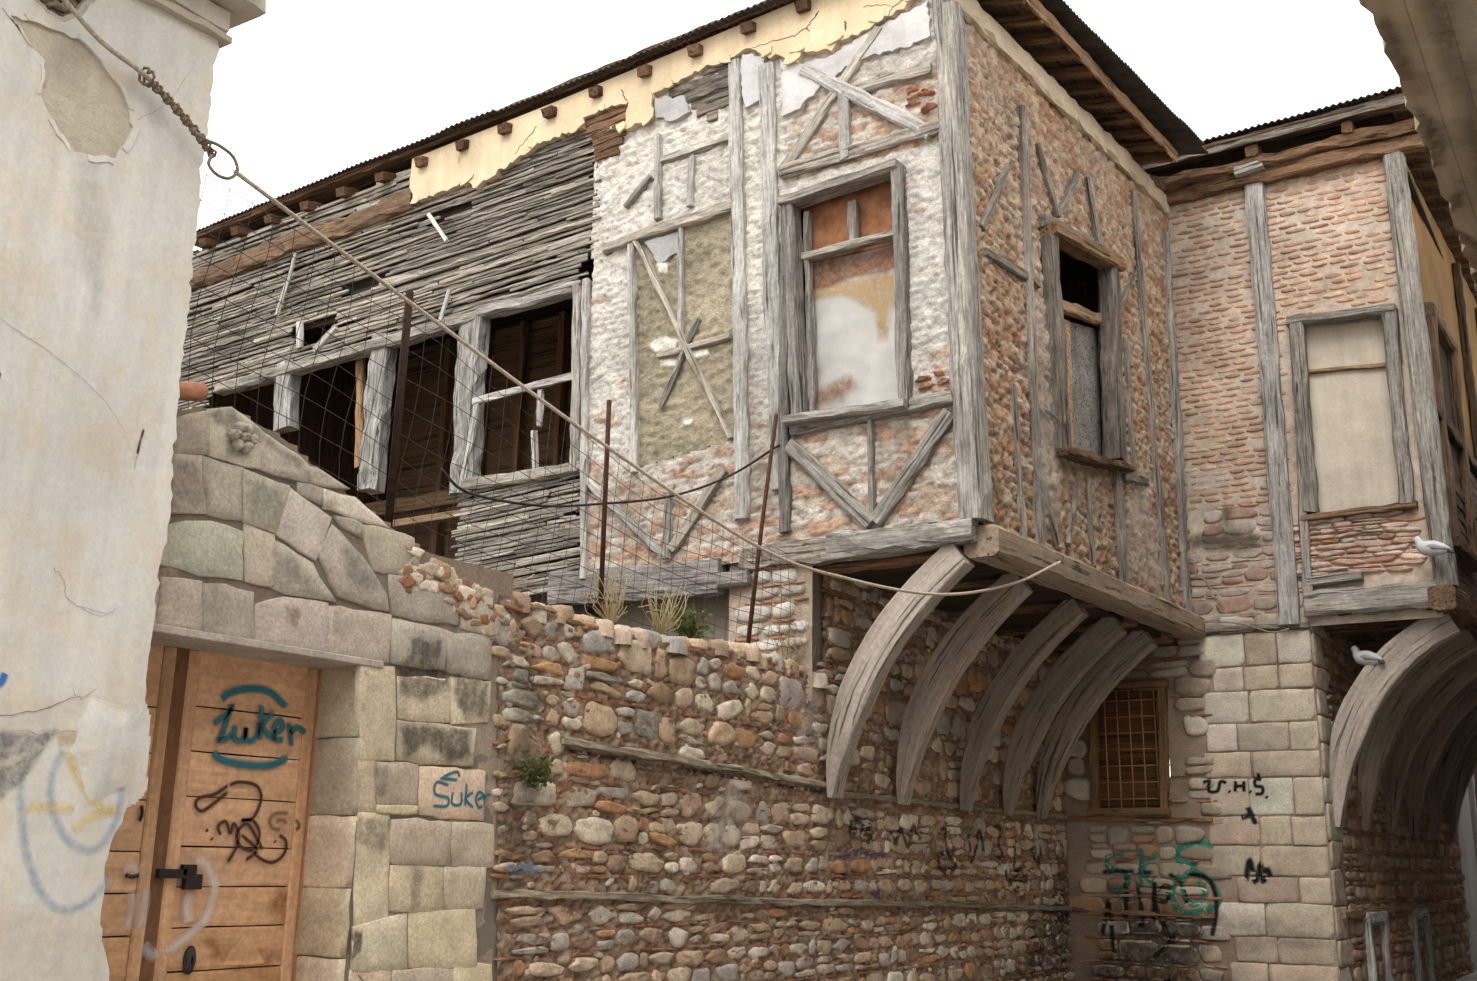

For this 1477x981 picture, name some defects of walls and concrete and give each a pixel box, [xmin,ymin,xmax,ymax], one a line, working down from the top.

flaking render [868,12,885,23]
flaking render [718,53,731,63]
flaking render [760,45,805,65]
flaking render [3,0,140,165]
spalling [905,87,938,114]
flaking render [569,119,585,134]
flaking render [616,106,654,133]
spalling [915,370,950,393]